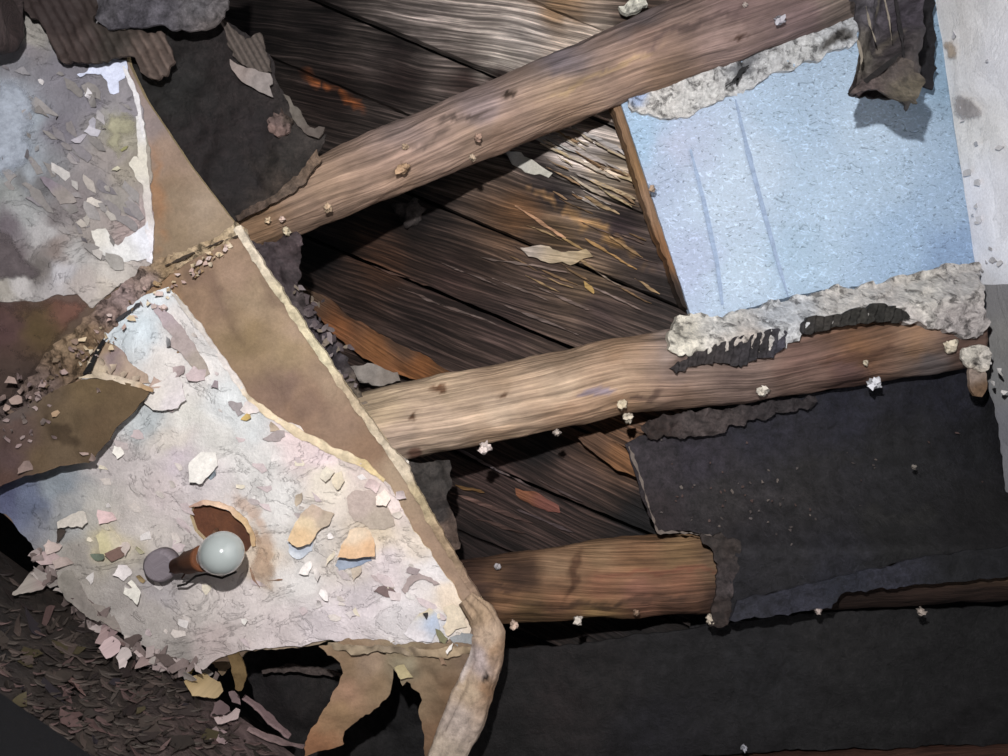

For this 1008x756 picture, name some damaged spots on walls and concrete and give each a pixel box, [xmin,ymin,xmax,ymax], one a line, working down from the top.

spalling [627,17,859,120]
peeling [1,59,155,270]
peeling [506,151,553,178]
peeling [0,303,219,487]
peeling [218,401,259,421]
peeling [263,422,303,442]
peeling [293,284,355,353]
spalling [665,247,1008,492]
peeling [0,503,279,756]
peeling [286,457,473,646]